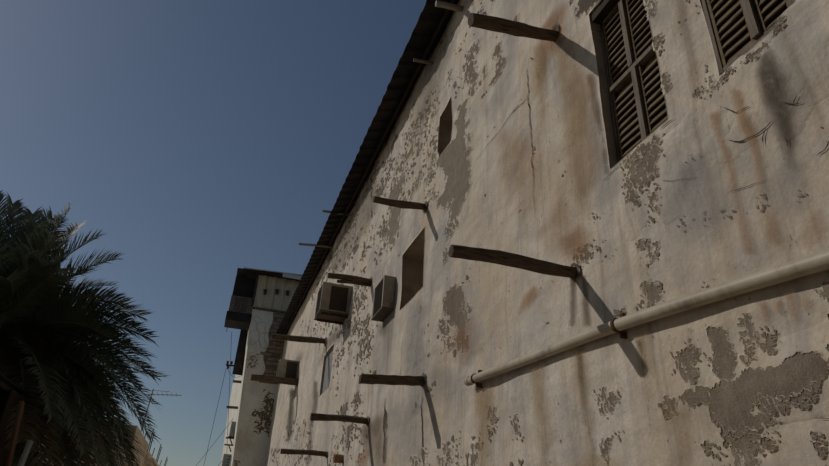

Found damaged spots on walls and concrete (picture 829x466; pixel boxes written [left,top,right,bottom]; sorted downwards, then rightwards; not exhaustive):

peeling [568,0,601,20]
crack [485,58,534,177]
crack [730,121,772,146]
peeling [300,25,510,397]
peeling [619,133,667,226]
peeling [613,237,664,318]
peeling [328,390,368,466]
peeling [409,404,523,466]
peeling [657,312,829,466]